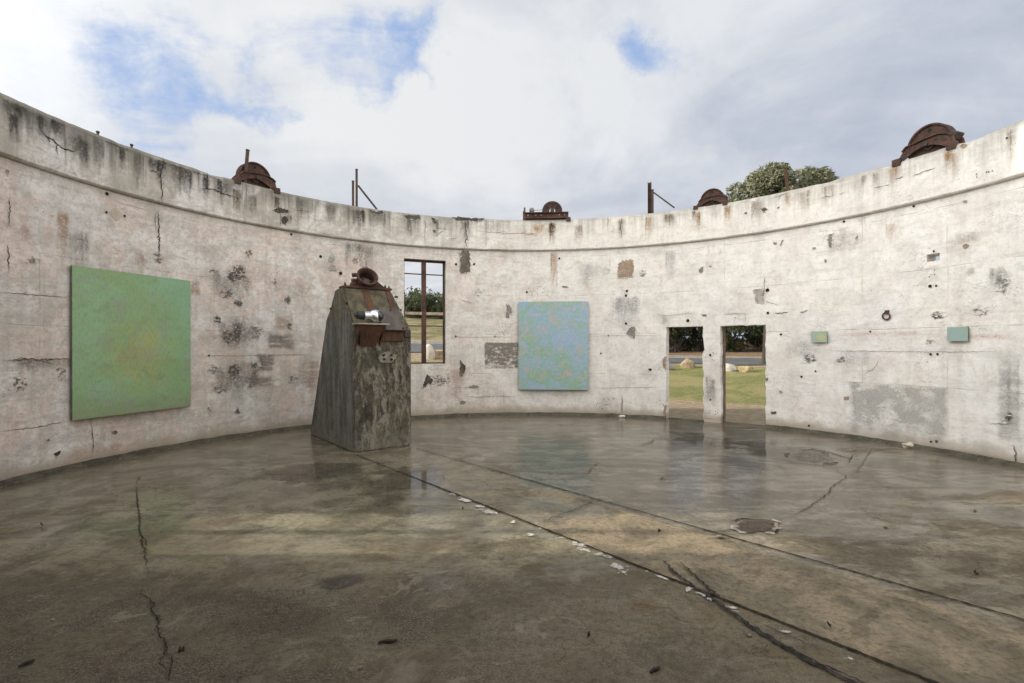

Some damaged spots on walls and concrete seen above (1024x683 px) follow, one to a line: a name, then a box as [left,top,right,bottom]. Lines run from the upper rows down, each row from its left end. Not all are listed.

crack [43,132,76,154]
damp [120,149,224,195]
crack [151,161,164,252]
spalling [460,250,472,274]
spalling [607,259,646,279]
crack [4,356,66,364]
crack [771,446,874,519]
spalling [731,518,782,534]
crack [135,476,173,678]